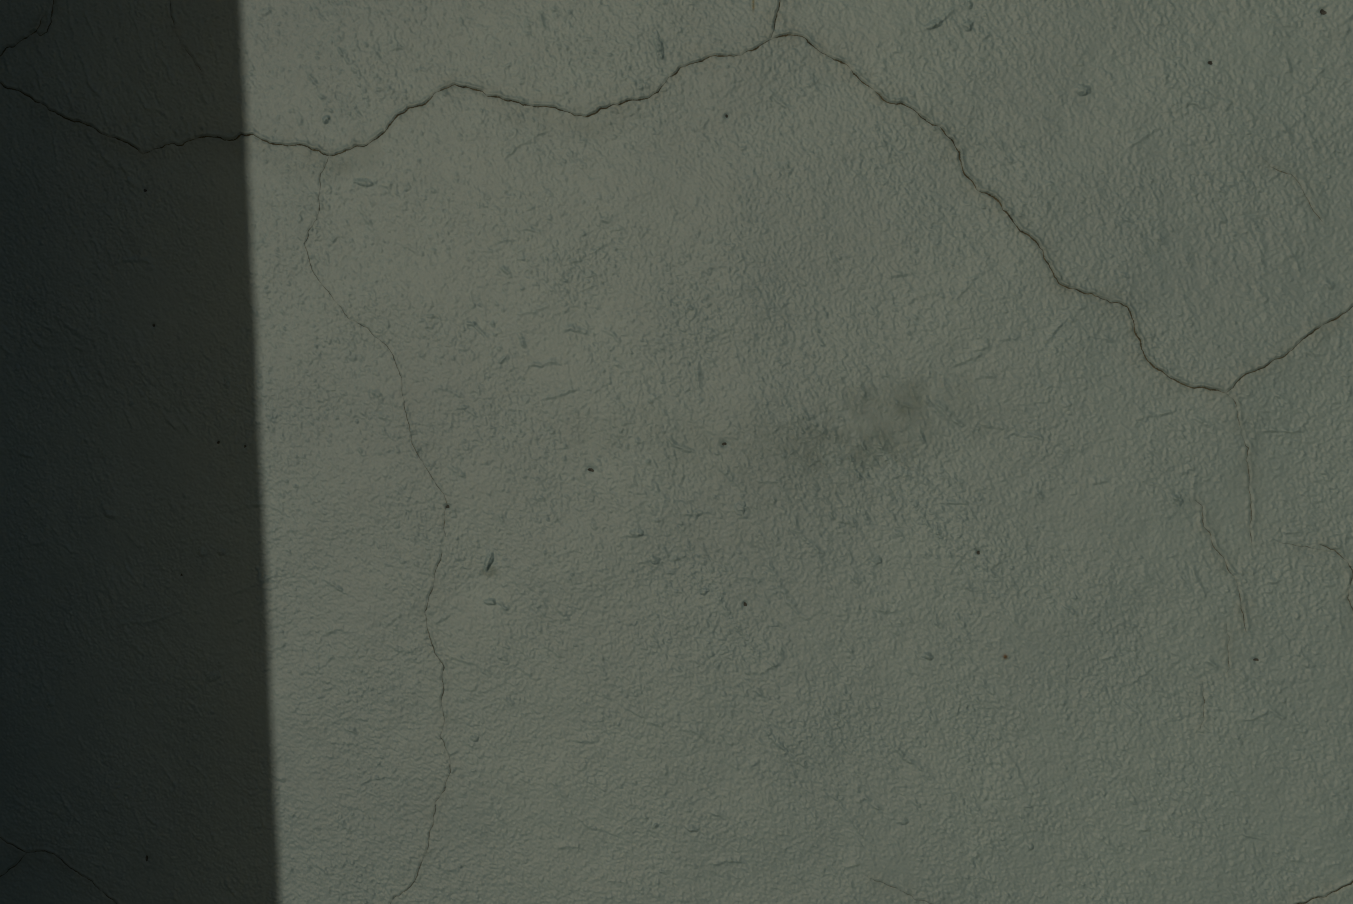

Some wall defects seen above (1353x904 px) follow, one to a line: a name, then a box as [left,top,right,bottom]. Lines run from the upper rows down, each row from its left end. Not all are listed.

crack [0,0,1353,543]
crack [1199,503,1246,728]
crack [1284,543,1353,610]
crack [390,554,451,904]
crack [1297,881,1353,904]